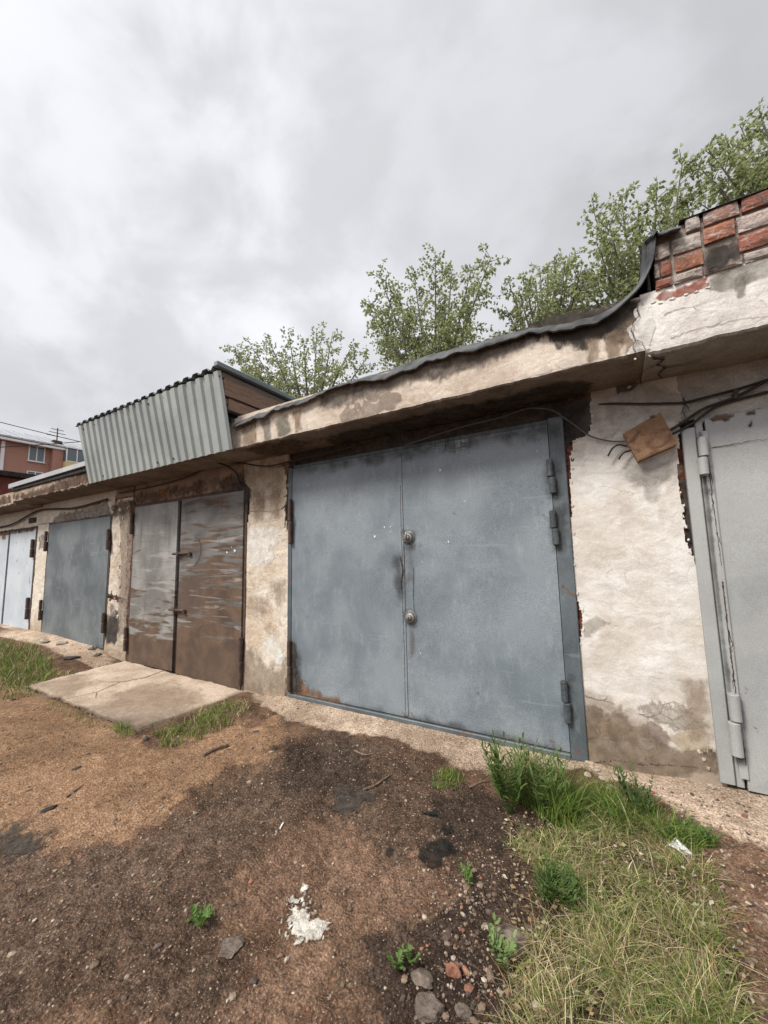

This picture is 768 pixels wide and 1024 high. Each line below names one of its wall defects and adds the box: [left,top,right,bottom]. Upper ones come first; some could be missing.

leakage [588,321,643,361]
flaking render [627,276,711,360]
crack [623,299,766,392]
spalling [679,479,694,556]
rust [294,672,346,705]
leakage [585,687,719,777]